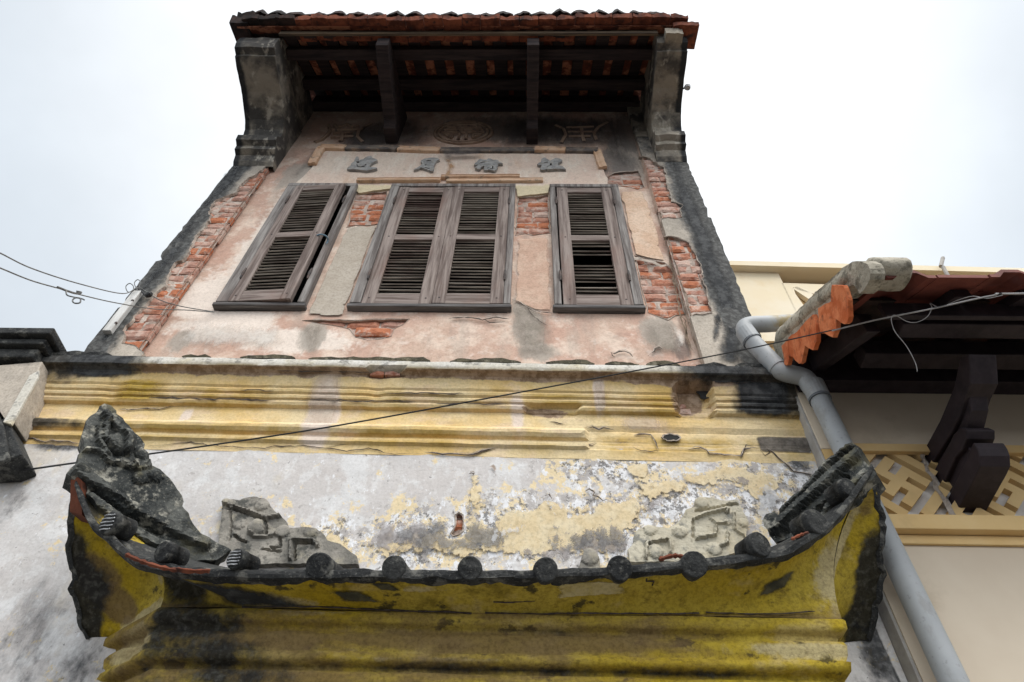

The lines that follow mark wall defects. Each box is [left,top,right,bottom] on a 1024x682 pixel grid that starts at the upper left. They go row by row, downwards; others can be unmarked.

flaking render [121,169,269,353]
flaking render [302,318,409,340]
flaking render [346,191,387,228]
peeling [515,195,551,310]
flaking render [607,156,712,325]
water stain [673,163,790,417]
peeling [365,464,782,560]